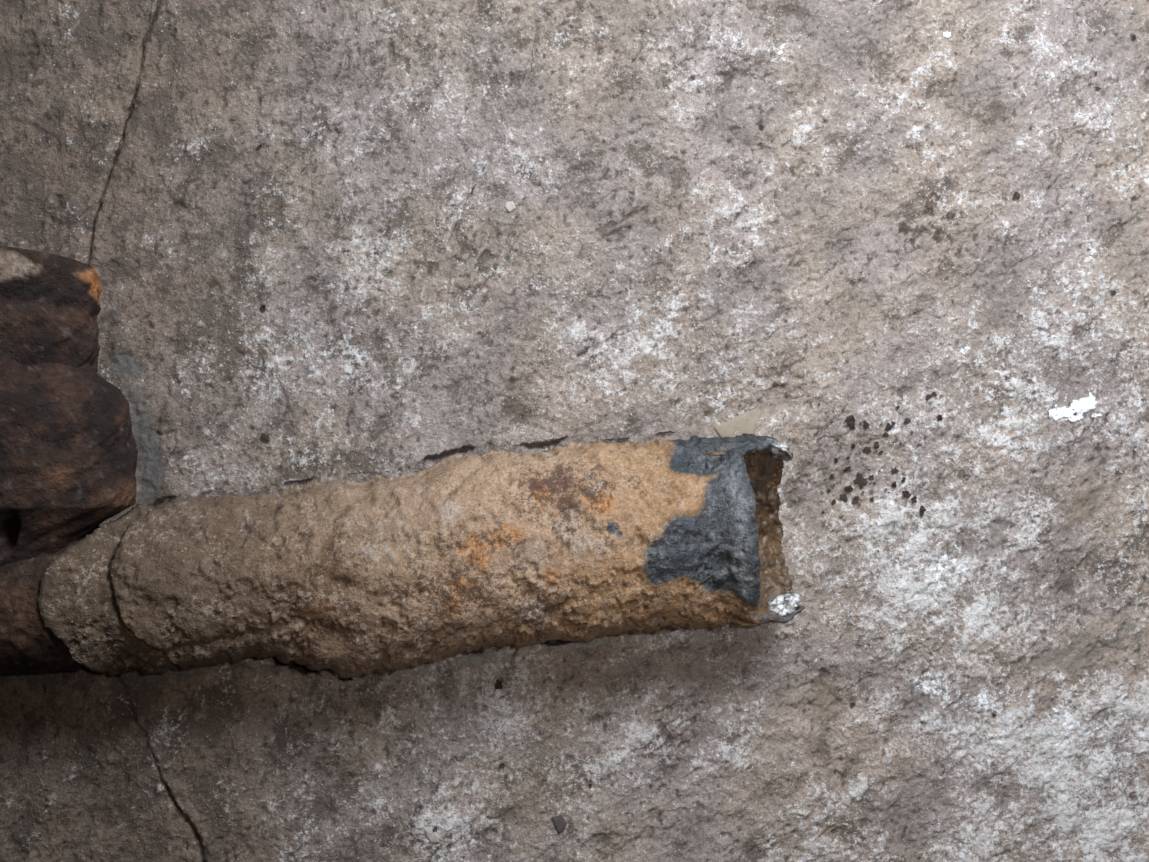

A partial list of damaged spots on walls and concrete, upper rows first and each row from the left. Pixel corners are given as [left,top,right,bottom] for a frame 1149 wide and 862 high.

crack [84,1,158,160]
crack [144,734,205,862]